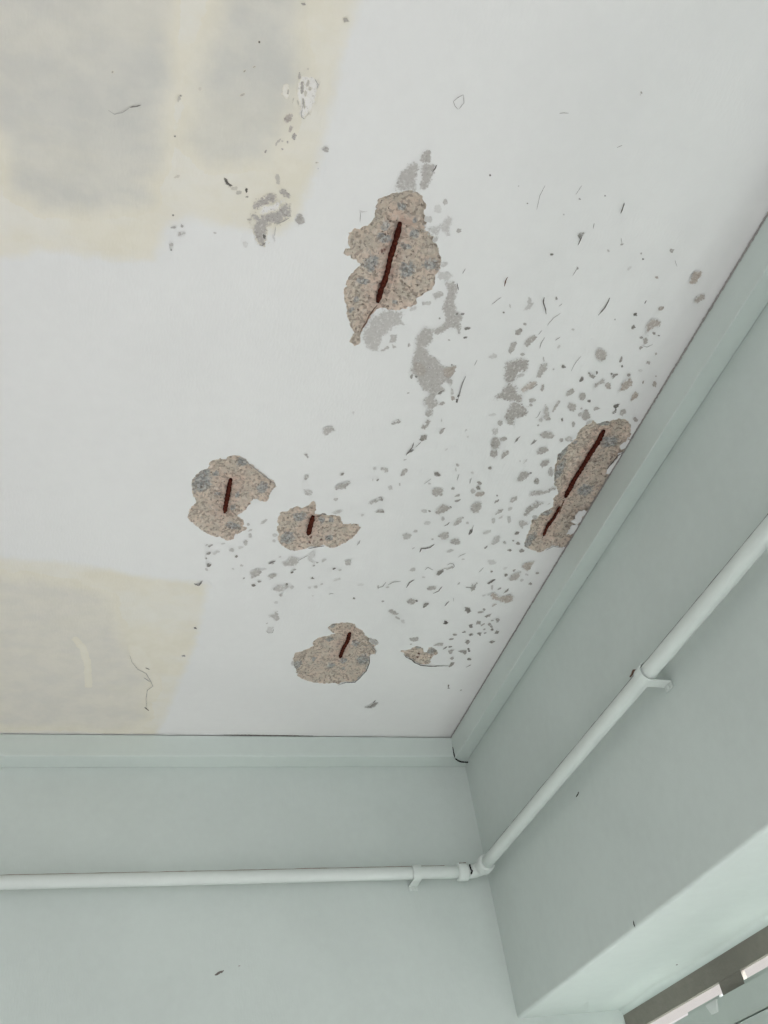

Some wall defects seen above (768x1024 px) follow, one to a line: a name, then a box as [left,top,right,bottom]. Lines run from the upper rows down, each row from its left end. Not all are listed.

water stain [0,0,370,267]
spalling [188,149,471,633]
spalling [377,296,664,668]
water stain [0,554,213,734]
spalling [290,622,379,685]